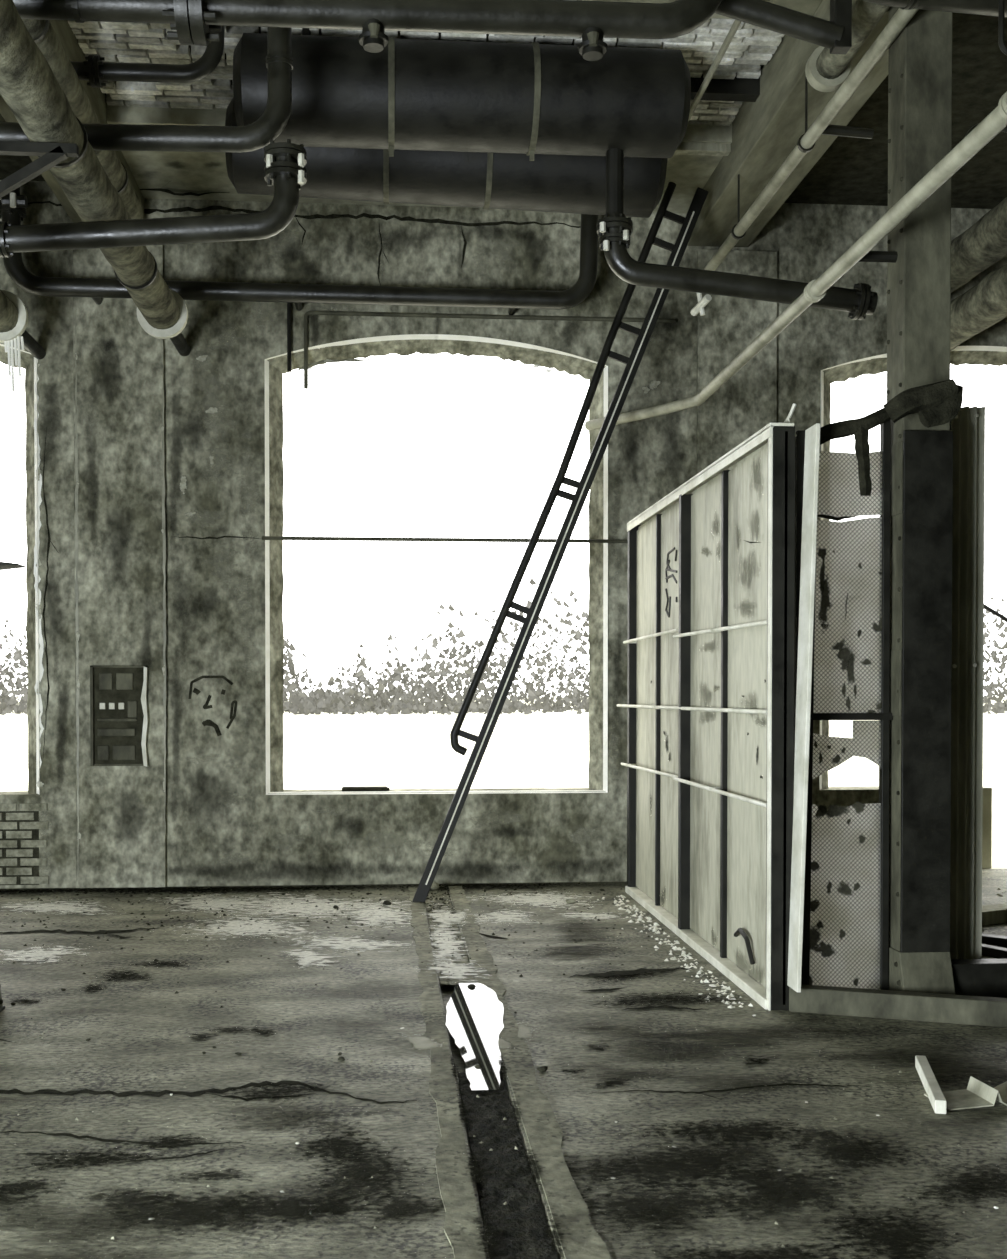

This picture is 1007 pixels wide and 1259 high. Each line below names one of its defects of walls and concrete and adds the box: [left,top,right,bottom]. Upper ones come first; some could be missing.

peeling [818,548,835,634]
peeling [832,617,882,711]
peeling [814,741,845,764]
peeling [815,801,865,824]
peeling [810,881,860,957]
damp [548,912,623,960]
crack [0,1080,417,1104]
damp [7,1134,214,1173]
crack [0,1130,246,1163]
damp [619,1119,832,1147]
damp [200,1195,369,1223]
damp [637,1238,868,1259]